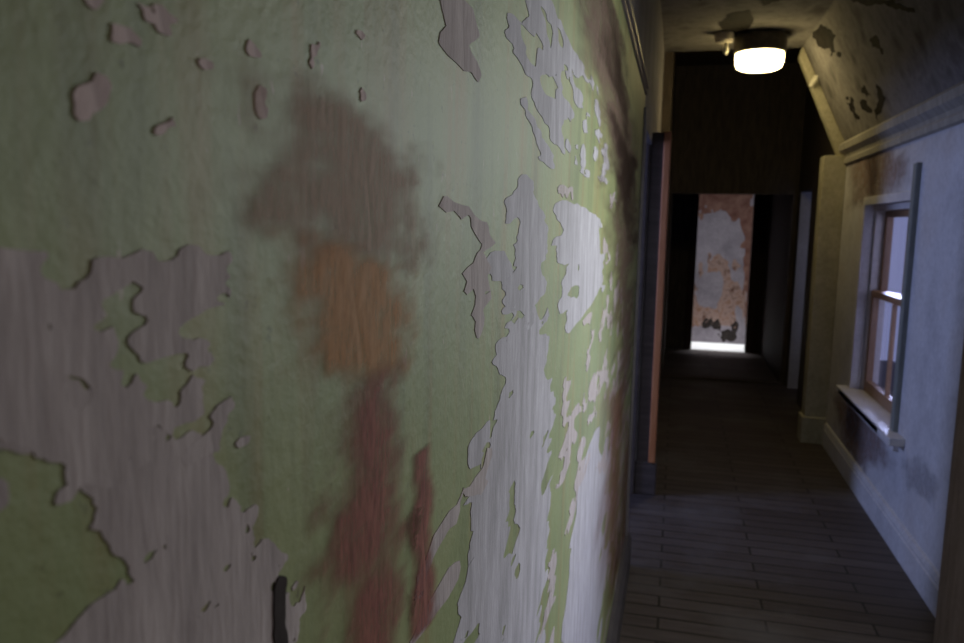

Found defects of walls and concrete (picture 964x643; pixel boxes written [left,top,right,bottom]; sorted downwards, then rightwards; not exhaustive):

peeling [812,24,842,57]
peeling [846,84,886,120]
peeling [692,194,754,342]
peeling [0,245,288,643]
peeling [286,581,307,643]